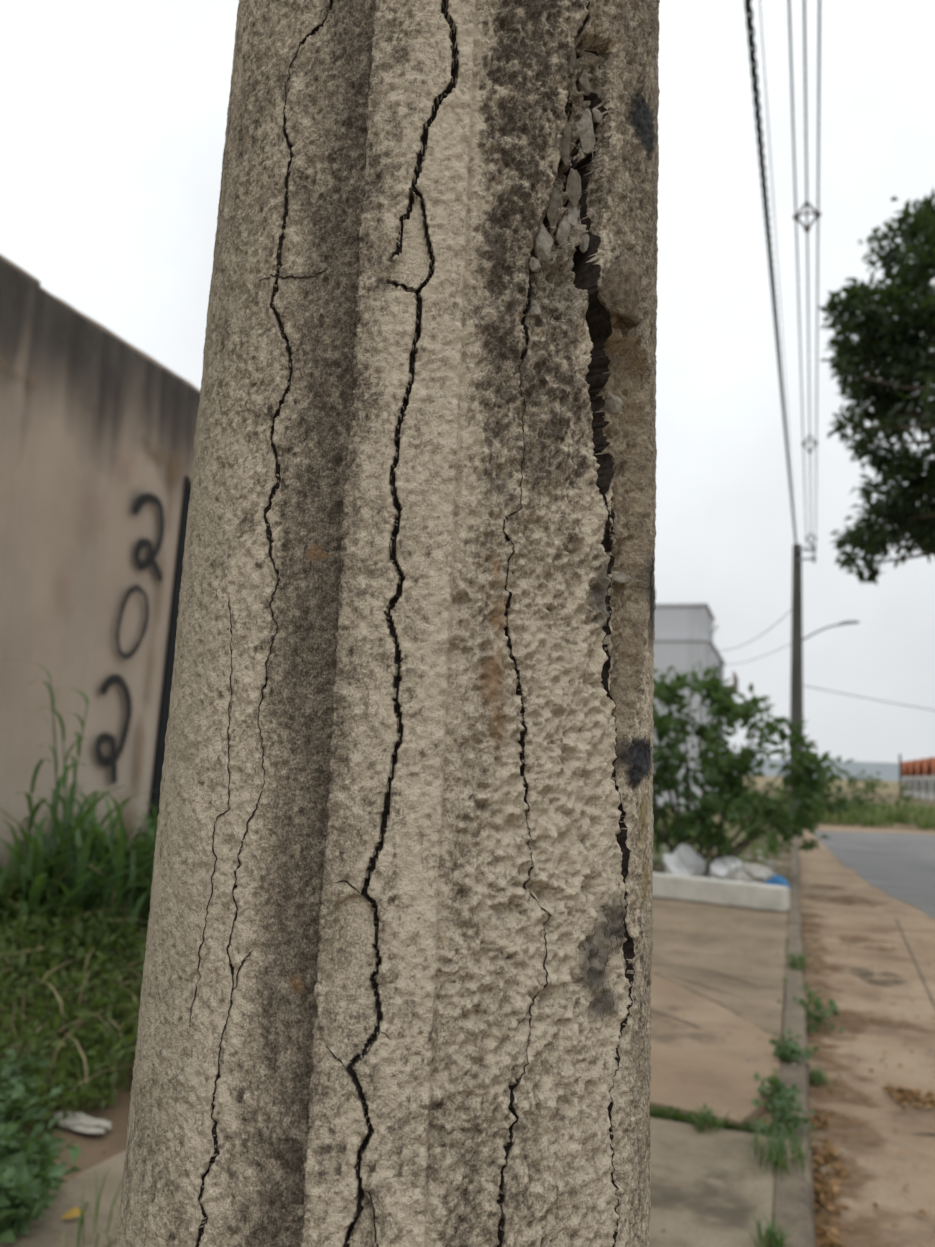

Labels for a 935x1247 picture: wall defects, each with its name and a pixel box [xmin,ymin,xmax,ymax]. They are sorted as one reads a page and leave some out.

crack [189,0,333,1247]
crack [326,0,459,1247]
spalling [528,34,615,321]
crack [577,2,599,59]
crack [497,92,756,1247]